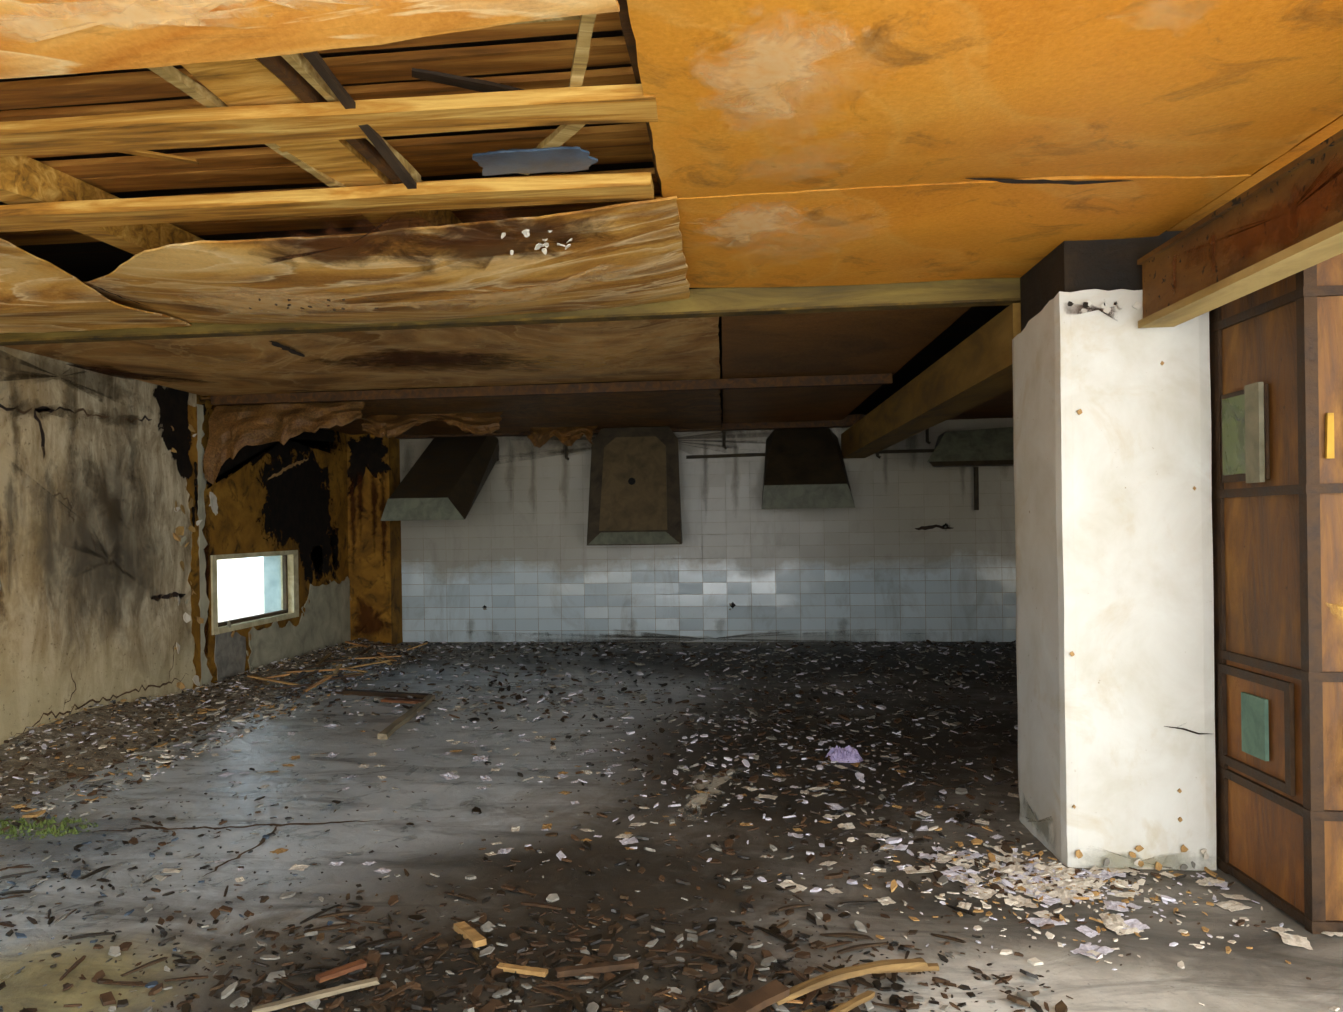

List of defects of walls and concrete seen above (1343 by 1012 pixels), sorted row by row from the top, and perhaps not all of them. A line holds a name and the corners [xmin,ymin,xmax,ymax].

leakage [4,0,245,39]
crack [965,177,1131,185]
leakage [266,209,607,272]
leakage [192,462,211,655]
leakage [354,598,384,635]